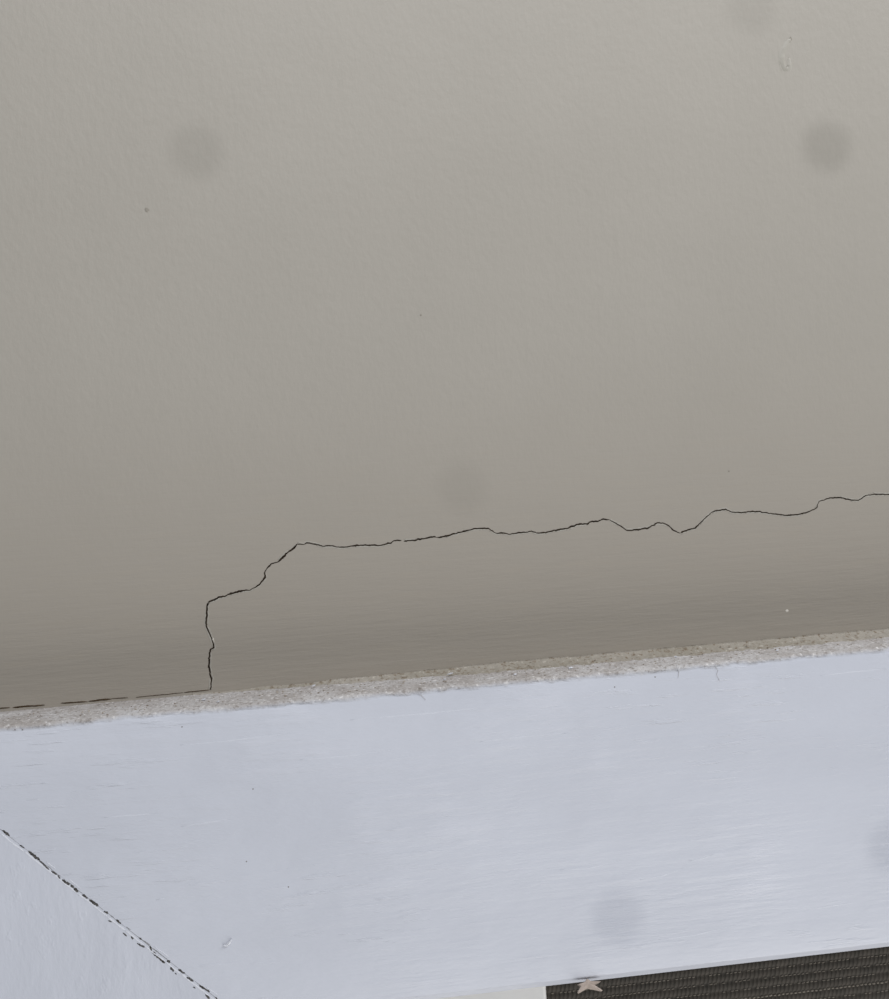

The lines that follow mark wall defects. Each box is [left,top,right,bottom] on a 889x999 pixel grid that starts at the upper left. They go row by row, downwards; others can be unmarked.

crack [204,493,889,690]
crack [0,829,218,999]